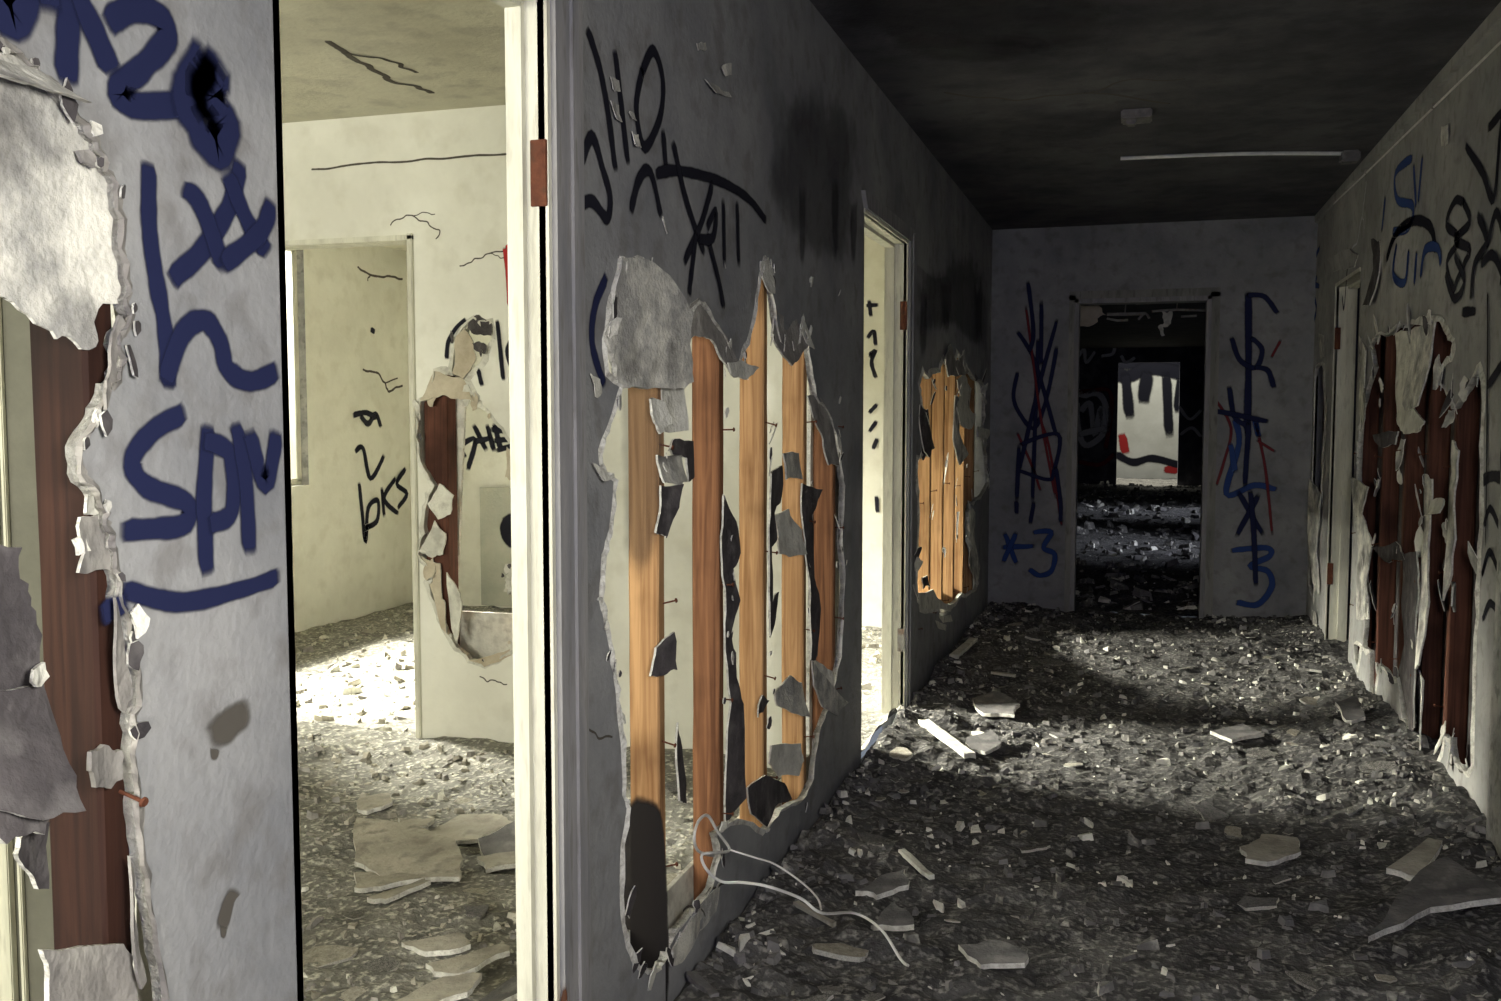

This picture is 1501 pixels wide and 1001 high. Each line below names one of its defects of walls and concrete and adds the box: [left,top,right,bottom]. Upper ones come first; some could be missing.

crack [325,41,435,94]
spalling [0,33,170,1001]
spalling [411,315,513,669]
spalling [590,255,848,991]
spalling [913,344,990,631]
spalling [1351,238,1486,778]